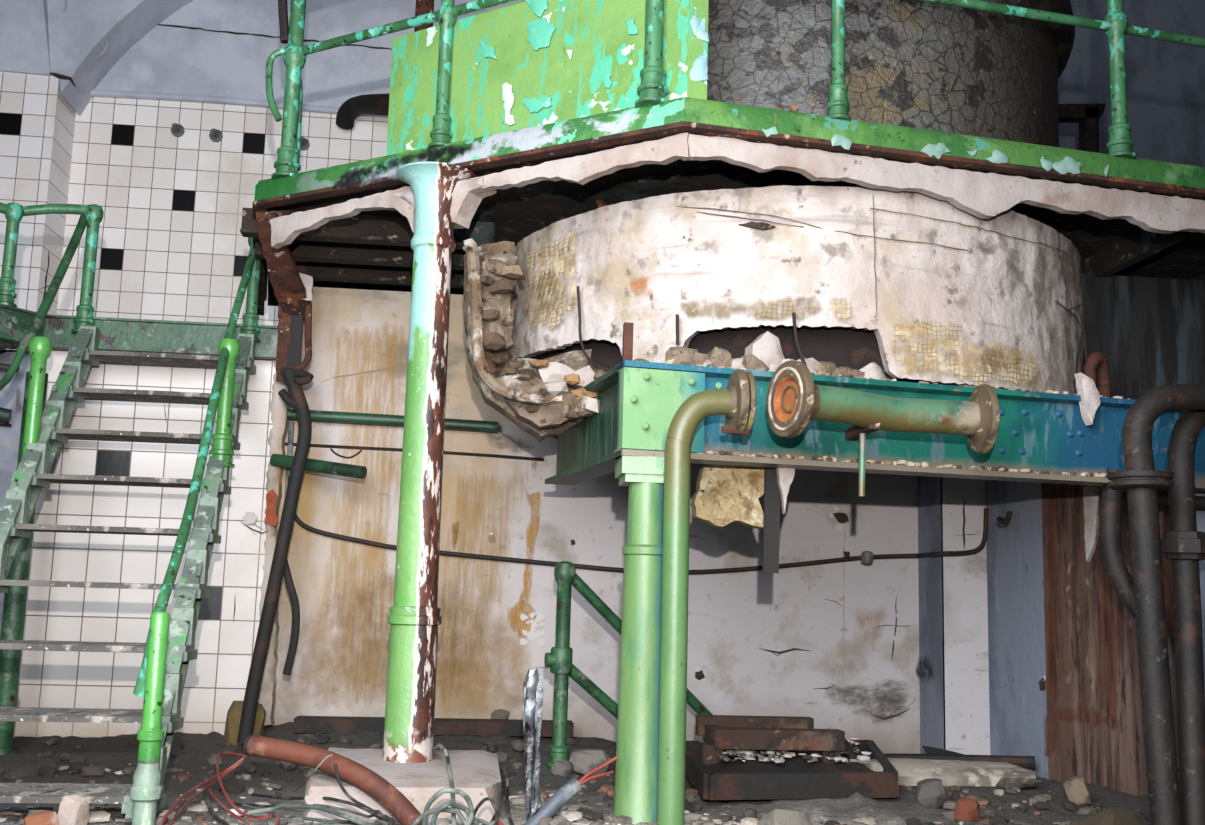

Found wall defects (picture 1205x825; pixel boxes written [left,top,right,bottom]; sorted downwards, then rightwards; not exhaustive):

peeling [480,41,497,59]
peeling [525,0,556,50]
peeling [625,18,638,35]
peeling [690,11,709,81]
peeling [502,82,551,125]
spalling [470,127,1205,234]
spalling [270,186,415,249]
crack [759,648,810,656]
crack [813,533,846,689]
crack [874,595,905,661]
leakage [836,683,901,721]